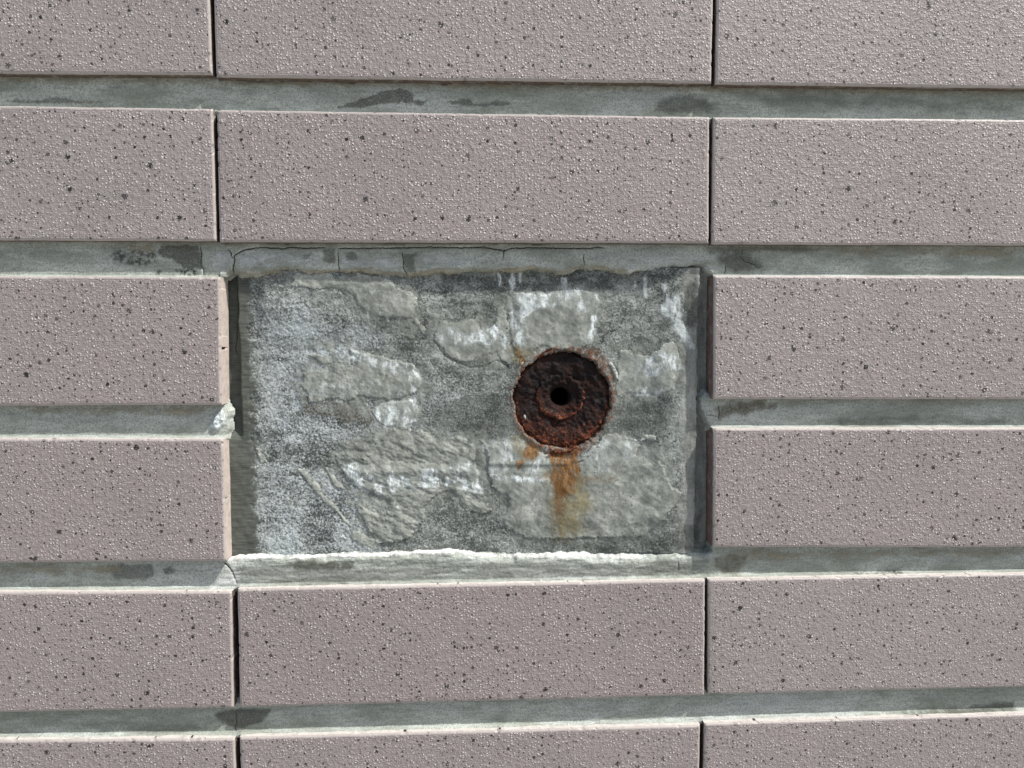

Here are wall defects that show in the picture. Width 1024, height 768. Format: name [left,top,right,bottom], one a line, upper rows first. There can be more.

peeling [291,272,601,374]
peeling [295,345,683,548]
rust [512,348,615,535]
peeling [608,305,693,397]